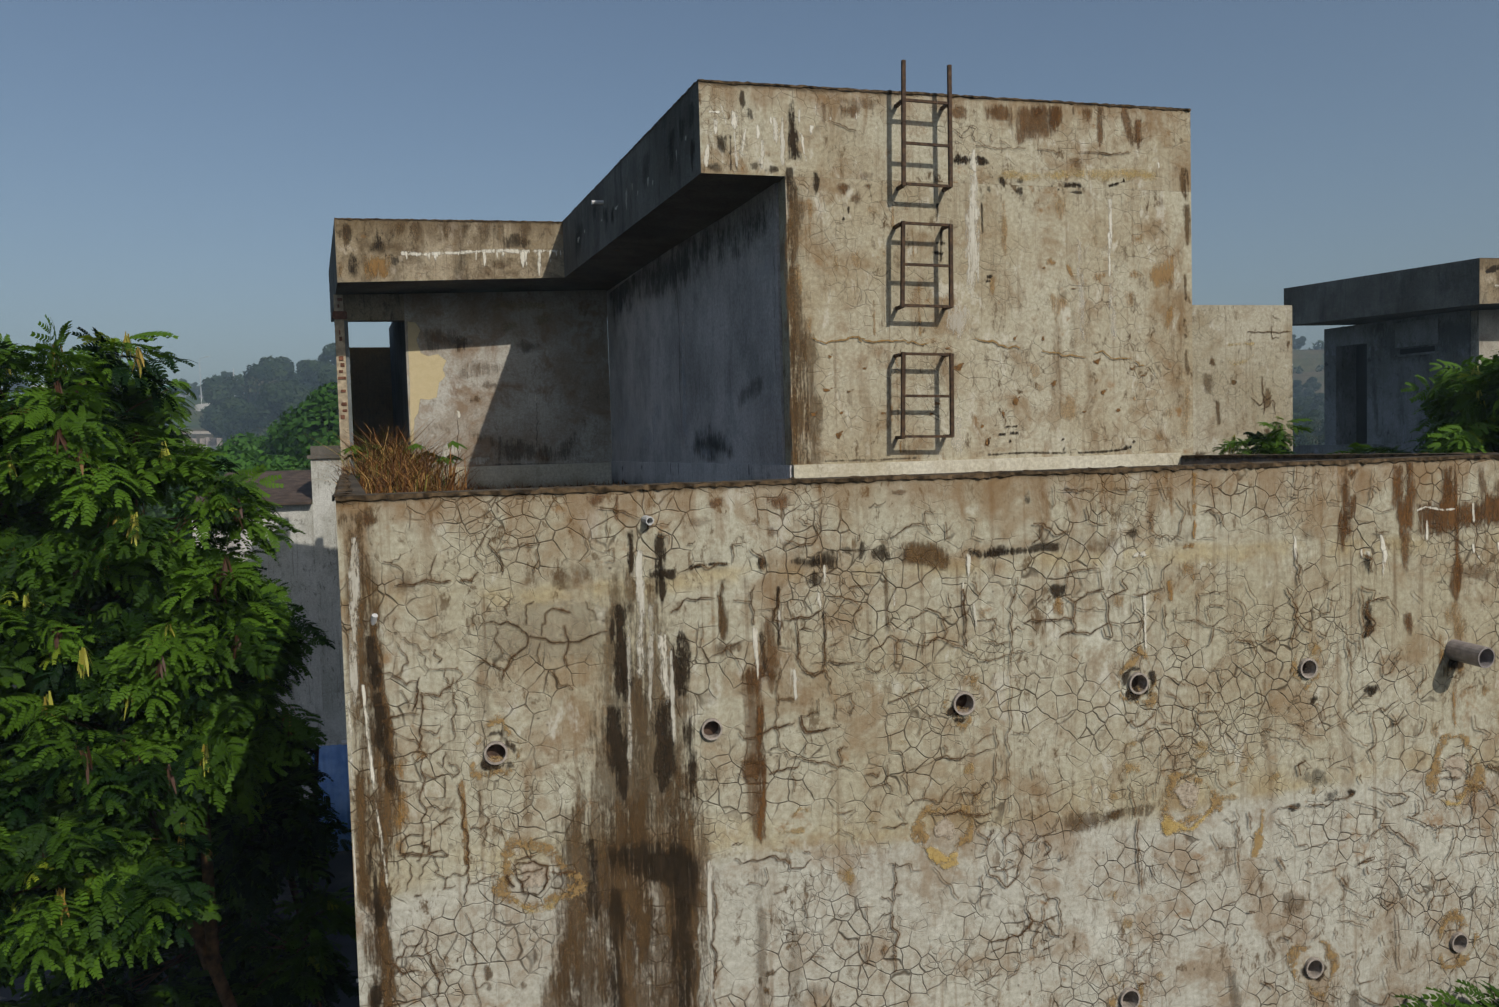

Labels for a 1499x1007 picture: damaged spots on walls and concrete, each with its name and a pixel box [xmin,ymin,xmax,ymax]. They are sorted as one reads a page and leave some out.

leakage [668,91,831,465]
leakage [988,445,1132,456]
leakage [791,550,837,658]
leakage [859,542,1059,626]
leakage [1050,584,1065,598]
rust [1338,469,1356,548]
rust [1404,613,1413,633]
rust [1393,462,1499,600]
leakage [338,508,401,1007]
leakage [543,530,797,1007]
leakage [947,705,965,723]
crack [581,468,1499,1007]